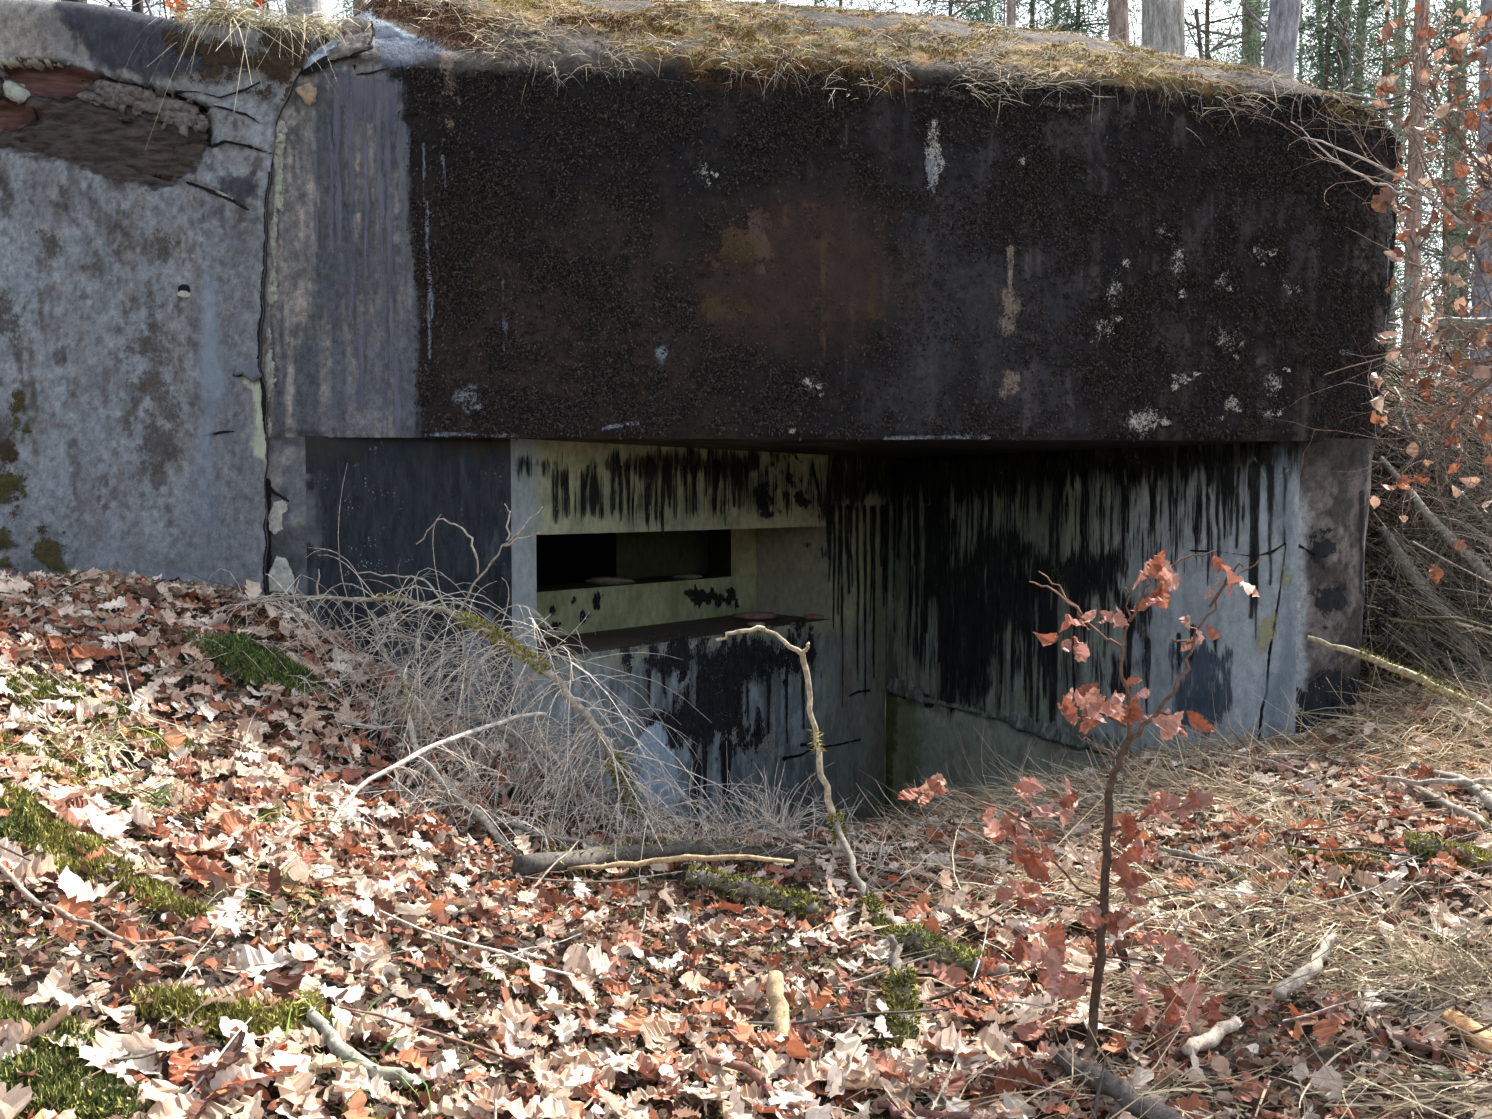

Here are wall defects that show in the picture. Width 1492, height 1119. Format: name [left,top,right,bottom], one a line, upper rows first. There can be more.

crack [301,21,384,76]
spalling [0,55,211,191]
water stain [1155,227,1186,298]
water stain [1090,259,1129,342]
crack [99,77,289,598]
water stain [1124,407,1170,438]
water stain [1171,372,1201,391]
water stain [1221,367,1291,420]
water stain [538,591,603,633]
water stain [548,453,1106,817]
water stain [1126,610,1151,714]